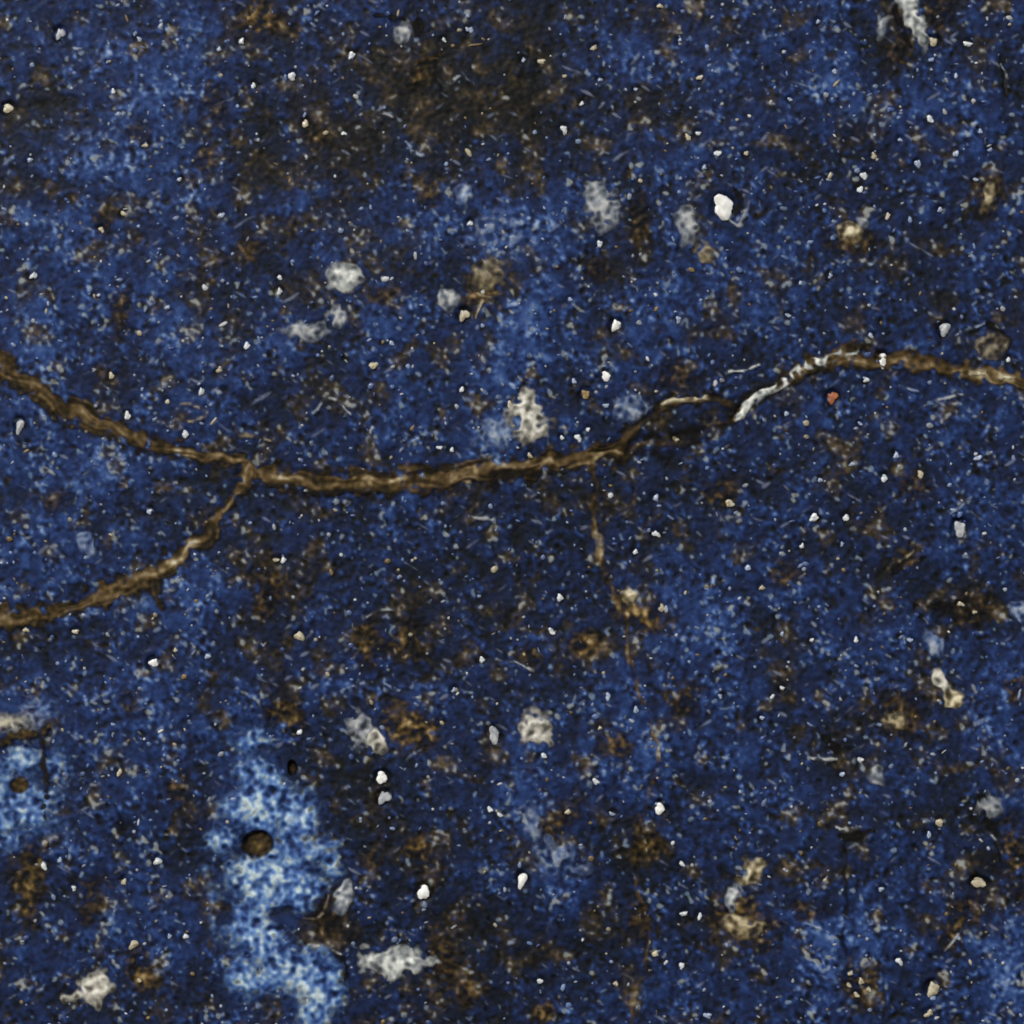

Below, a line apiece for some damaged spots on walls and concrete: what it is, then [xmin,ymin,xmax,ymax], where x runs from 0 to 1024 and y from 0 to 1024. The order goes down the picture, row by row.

crack [0,321,1024,756]
crack [630,881,648,1024]